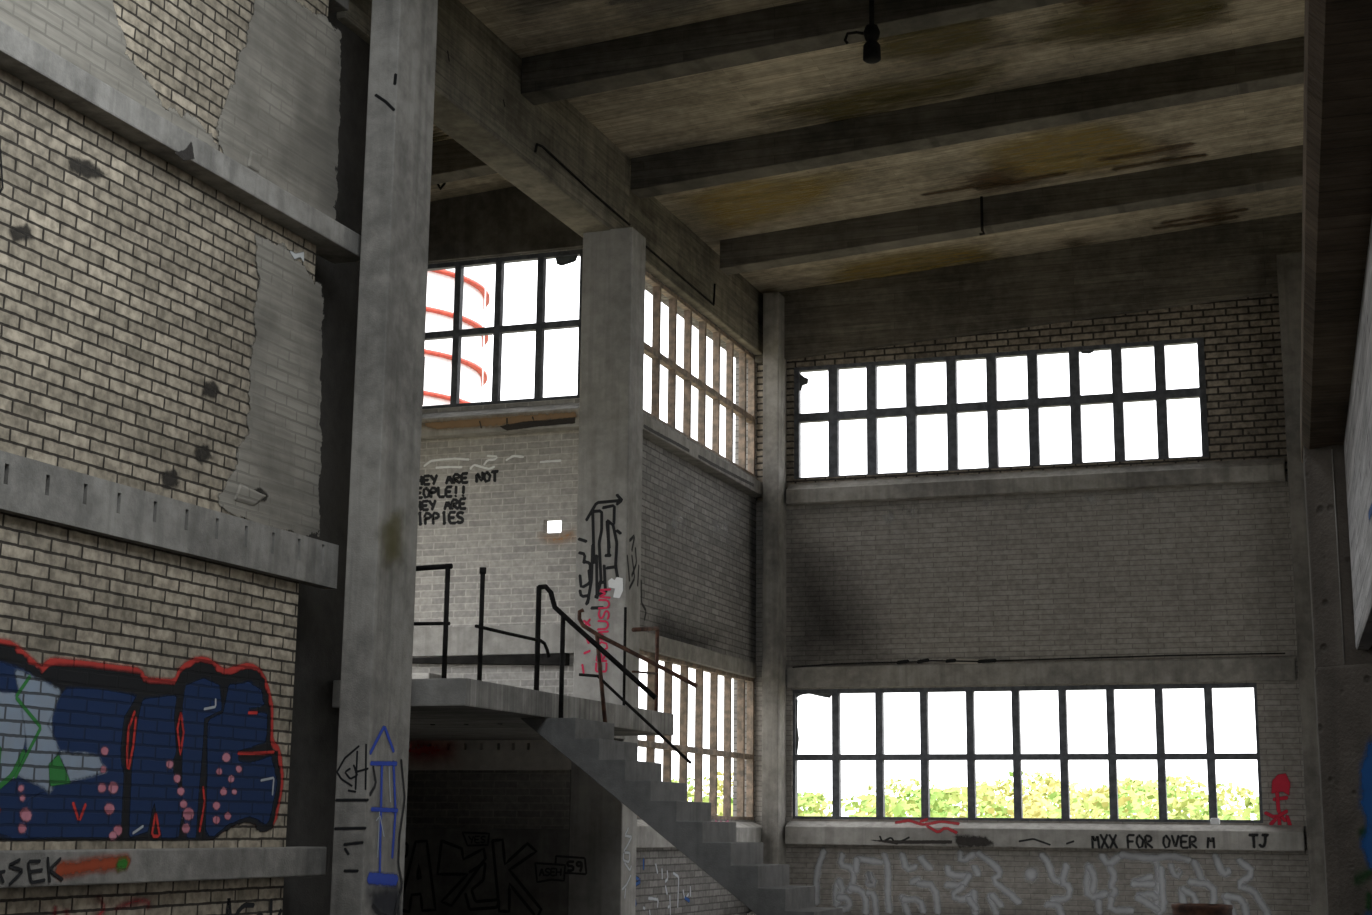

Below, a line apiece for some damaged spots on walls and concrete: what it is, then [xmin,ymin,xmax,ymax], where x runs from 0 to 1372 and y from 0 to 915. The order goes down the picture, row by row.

spalling [175,142,194,161]
spalling [69,157,104,178]
spalling [10,223,32,242]
spalling [202,381,220,398]
spalling [195,445,212,463]
spalling [162,469,179,489]